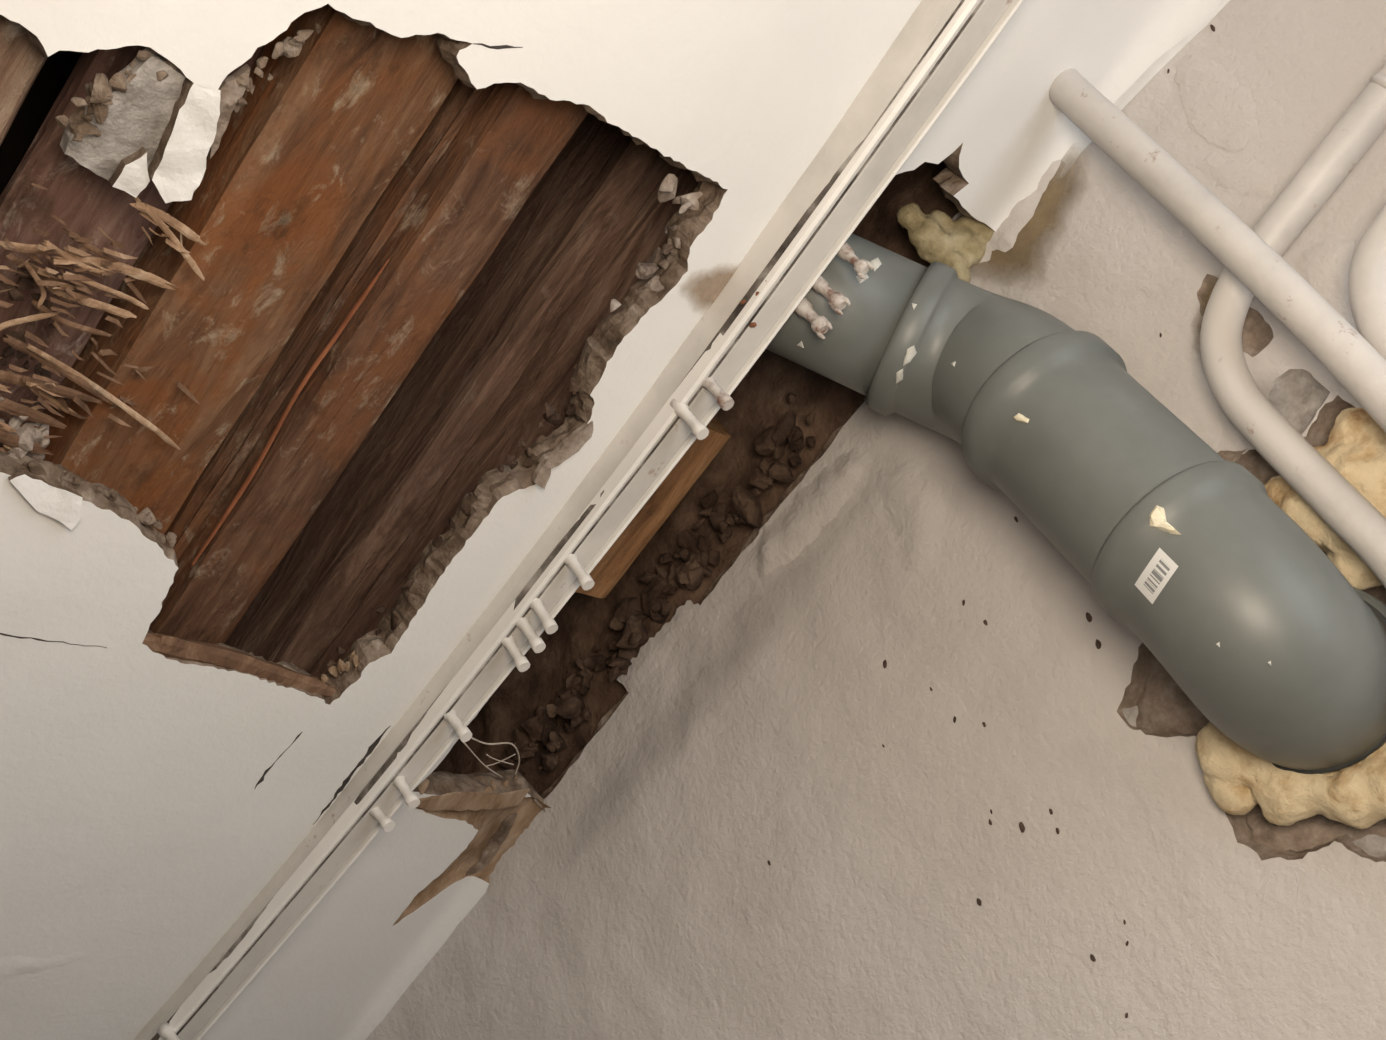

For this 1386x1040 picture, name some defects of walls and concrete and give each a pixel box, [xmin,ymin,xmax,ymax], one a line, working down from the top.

flaking render [207,64,250,159]
spalling [1197,274,1218,316]
peeling [1299,237,1358,331]
spalling [1242,307,1274,358]
spalling [1269,369,1356,447]
flaking render [531,421,594,489]
spalling [1218,449,1279,485]
flaking render [8,471,83,530]
spalling [1362,585,1386,605]
crack [0,633,107,648]
spalling [1117,643,1210,737]
spalling [1225,803,1386,862]